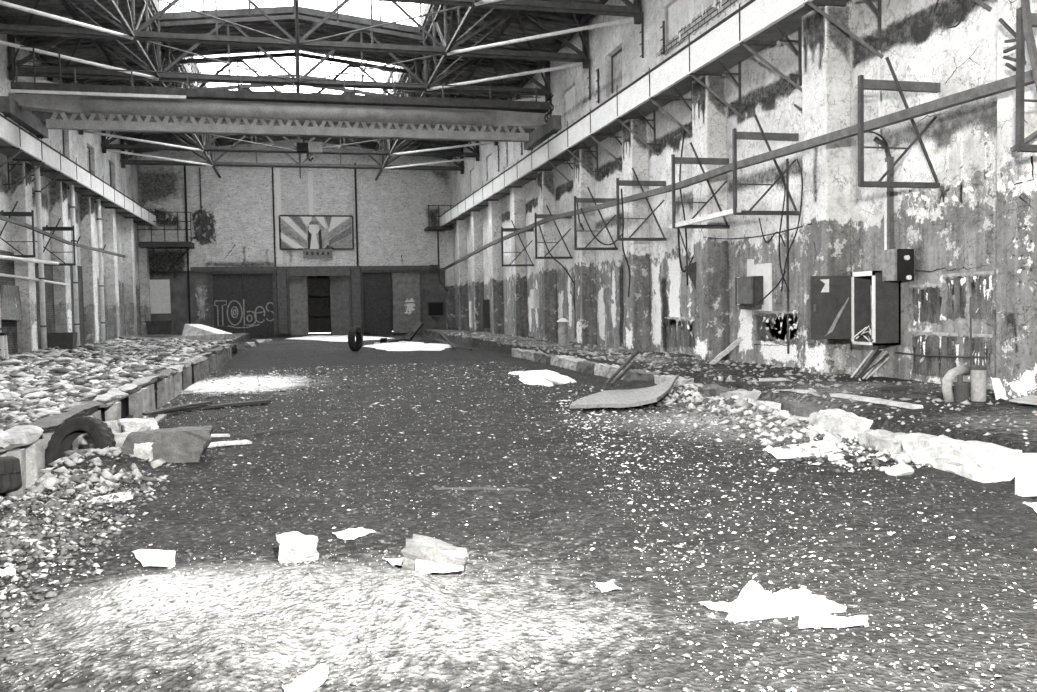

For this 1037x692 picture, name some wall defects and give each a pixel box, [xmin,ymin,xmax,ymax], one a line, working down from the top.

spalling [657,0,740,57]
damp [525,0,997,214]
peeling [527,279,538,332]
peeling [557,275,582,343]
peeling [597,270,634,349]
spalling [650,256,708,360]
spalling [909,271,1037,398]